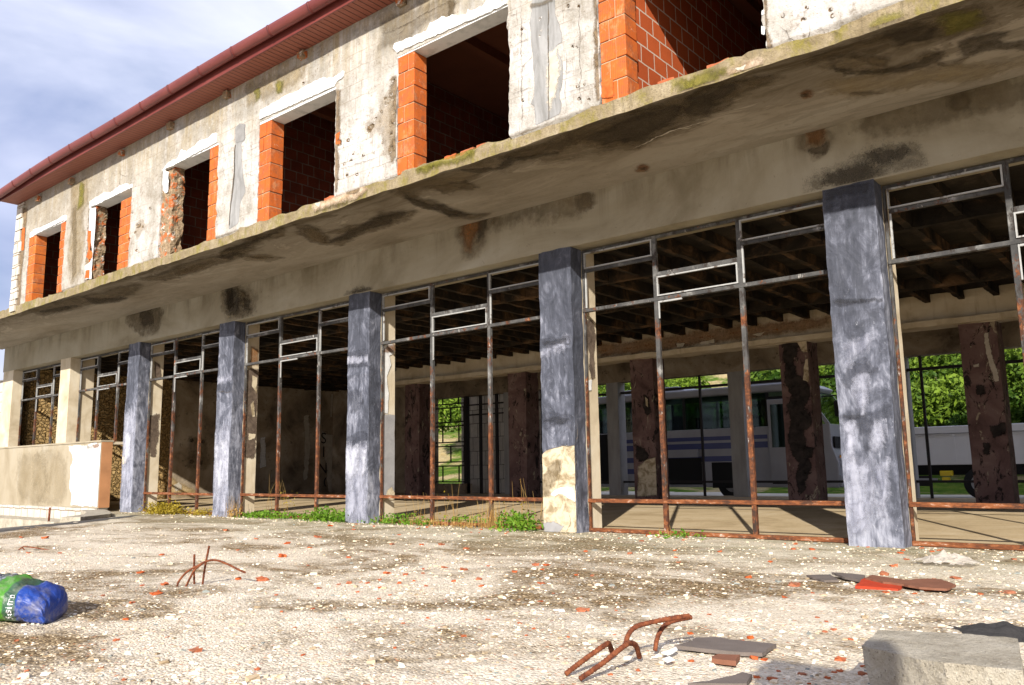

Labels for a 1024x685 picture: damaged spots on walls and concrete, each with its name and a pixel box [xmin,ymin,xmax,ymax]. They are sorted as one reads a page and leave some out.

leakage [813,6,1024,75]
leakage [28,76,770,315]
leakage [818,142,924,195]
leakage [128,308,160,335]